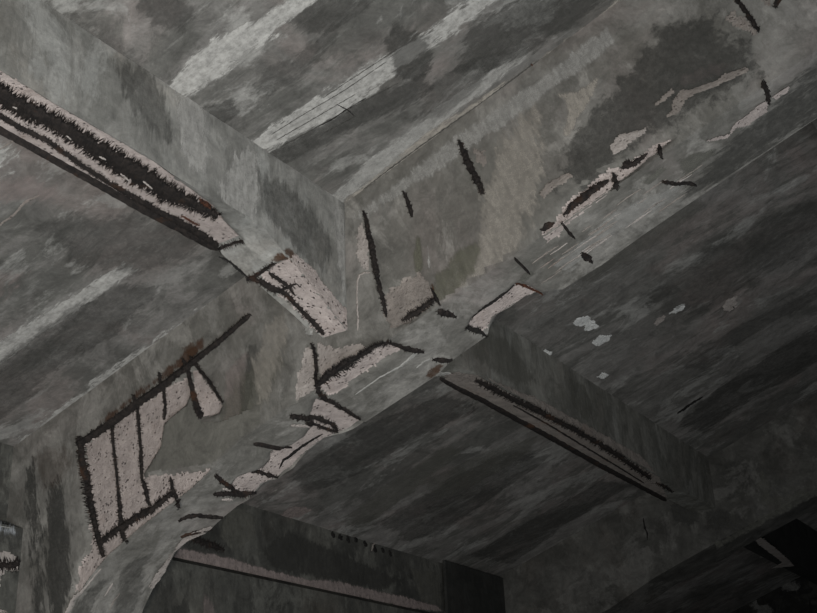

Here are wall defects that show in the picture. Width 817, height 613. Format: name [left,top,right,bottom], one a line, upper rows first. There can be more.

spalling [0,71,245,254]
spalling [539,127,671,243]
spalling [65,210,674,613]
spalling [0,551,21,587]